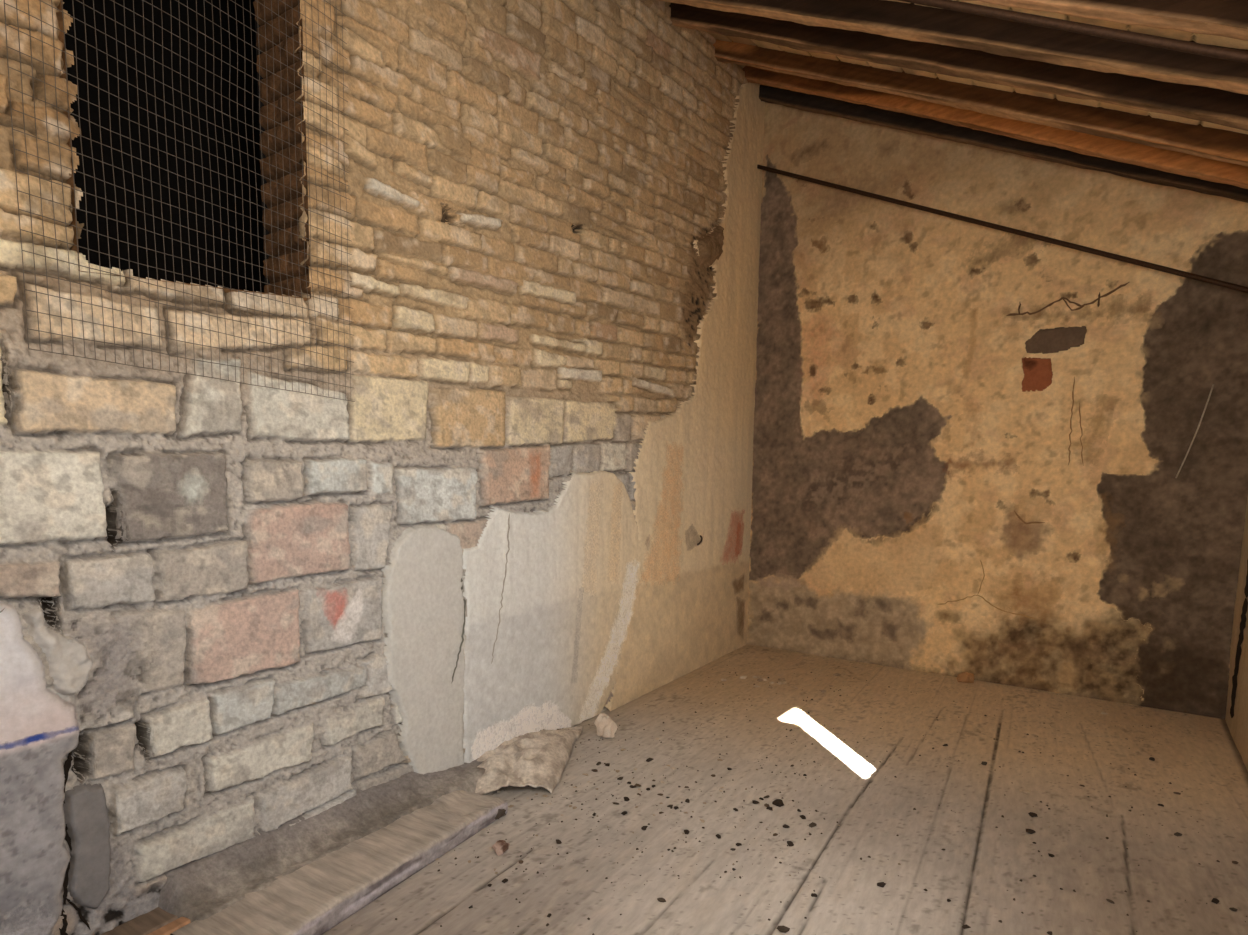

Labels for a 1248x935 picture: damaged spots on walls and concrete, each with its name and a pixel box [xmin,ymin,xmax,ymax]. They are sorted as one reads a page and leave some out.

flaking render [1023,231,1078,300]
peeling [315,587,364,645]
flaking render [462,82,953,763]
water stain [747,486,1231,719]
flaking render [1028,488,1056,507]
spalling [1066,228,1248,642]
flaking render [0,600,154,925]